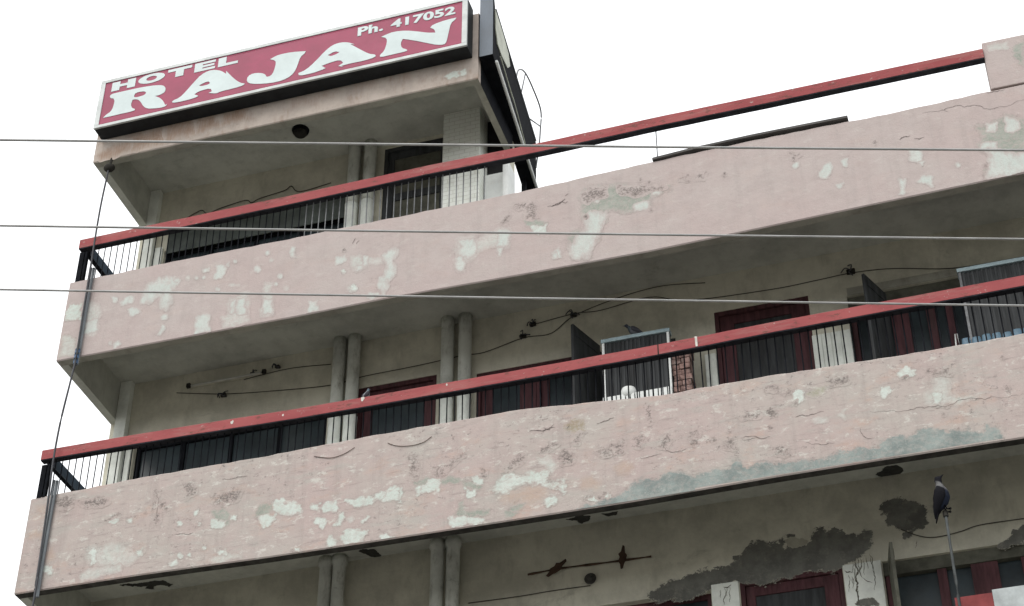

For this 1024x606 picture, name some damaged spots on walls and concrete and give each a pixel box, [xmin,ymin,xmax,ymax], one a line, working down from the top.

peeling [974,112,1024,180]
peeling [451,219,549,274]
peeling [550,181,673,262]
peeling [58,250,290,358]
water stain [686,384,782,452]
peeling [254,455,568,558]
spalling [565,423,1005,524]
spalling [878,495,930,540]
peeling [78,541,173,590]
peeling [168,546,243,567]
spalling [647,526,874,604]
spalling [855,597,879,606]